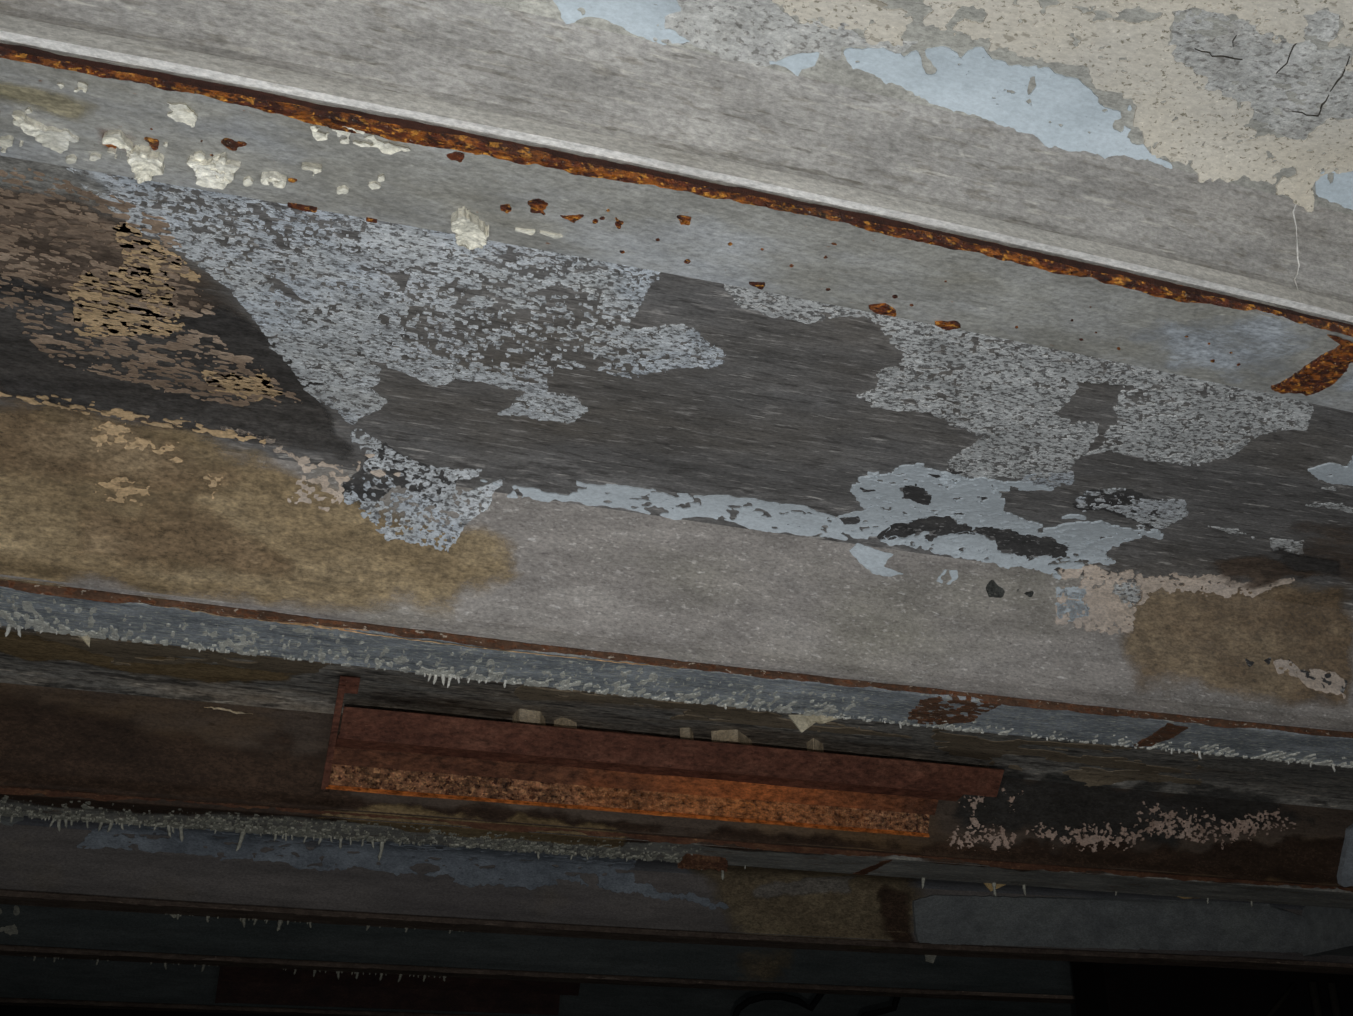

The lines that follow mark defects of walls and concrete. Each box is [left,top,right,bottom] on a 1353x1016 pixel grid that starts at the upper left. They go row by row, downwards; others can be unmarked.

peeling [553,0,1353,212]
water stain [0,156,233,320]
rust [0,43,1353,396]
peeling [0,107,1314,635]
flaking render [36,631,333,673]
water stain [0,405,1014,736]
rust [0,579,1353,747]
water stain [1126,530,1353,702]
rust [1216,557,1317,589]
peeling [1305,456,1353,513]
rust [0,701,1353,892]
water stain [947,770,1296,852]